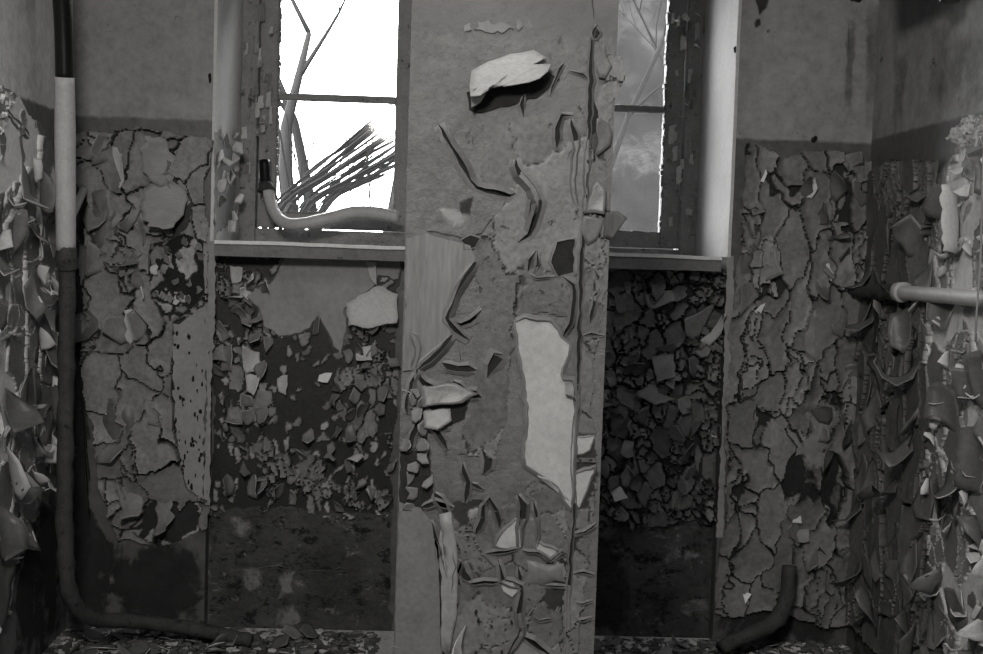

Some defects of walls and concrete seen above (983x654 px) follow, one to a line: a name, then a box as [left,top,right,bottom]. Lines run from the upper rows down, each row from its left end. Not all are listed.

peeling [0,86,59,633]
peeling [81,629,199,654]
peeling [75,126,401,649]
peeling [248,73,273,133]
peeling [671,12,705,51]
peeling [394,43,983,654]